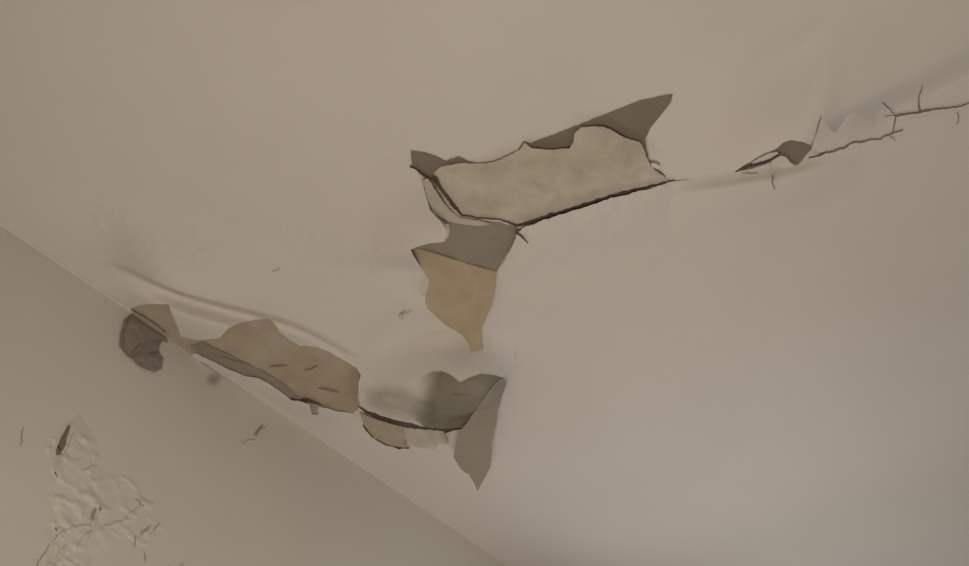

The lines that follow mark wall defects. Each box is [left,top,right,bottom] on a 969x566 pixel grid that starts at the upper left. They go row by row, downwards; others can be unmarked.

peeling [410,94,693,352]
crack [670,87,969,234]
peeling [119,304,506,490]